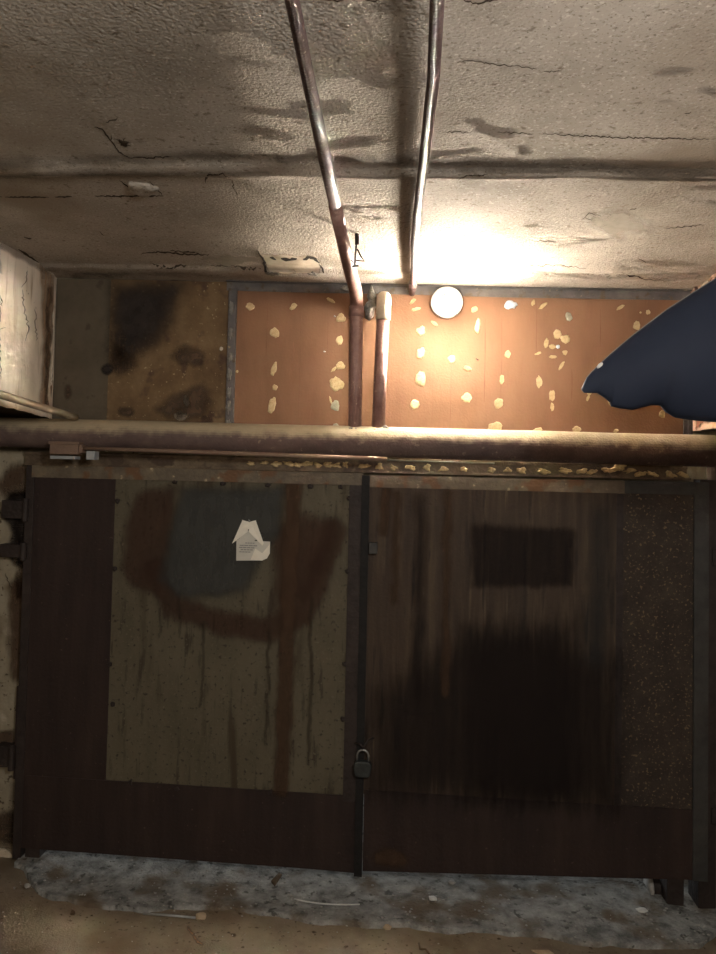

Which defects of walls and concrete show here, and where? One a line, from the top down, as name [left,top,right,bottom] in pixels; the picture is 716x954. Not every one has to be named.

crack [464,0,495,8]
crack [457,60,560,73]
crack [500,132,707,140]
crack [0,193,72,201]
crack [142,250,261,271]
spalling [258,250,324,276]
crack [0,237,39,374]